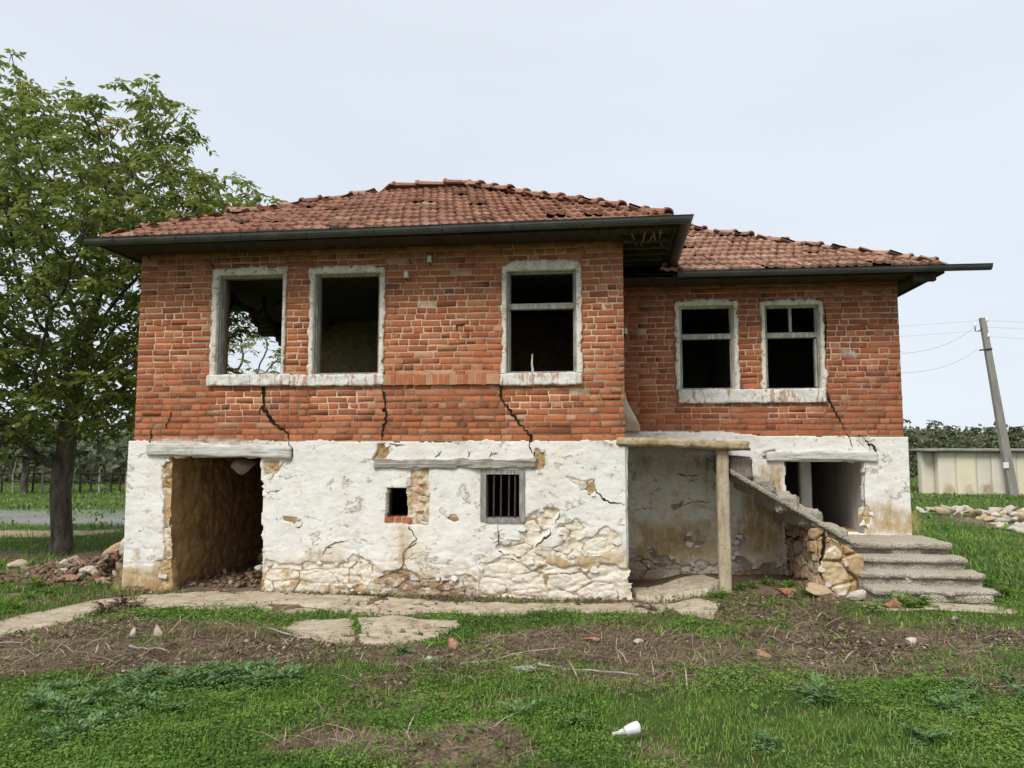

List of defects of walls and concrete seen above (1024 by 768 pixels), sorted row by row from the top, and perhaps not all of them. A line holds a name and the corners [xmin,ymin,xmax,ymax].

crack [259,386,293,458]
flaking render [373,443,390,461]
crack [381,387,404,446]
crack [499,384,535,470]
crack [824,310,877,530]
flaking render [406,468,430,525]
crack [593,479,654,511]
crack [398,523,418,570]
flaking render [264,502,718,600]
flaking render [731,534,787,575]